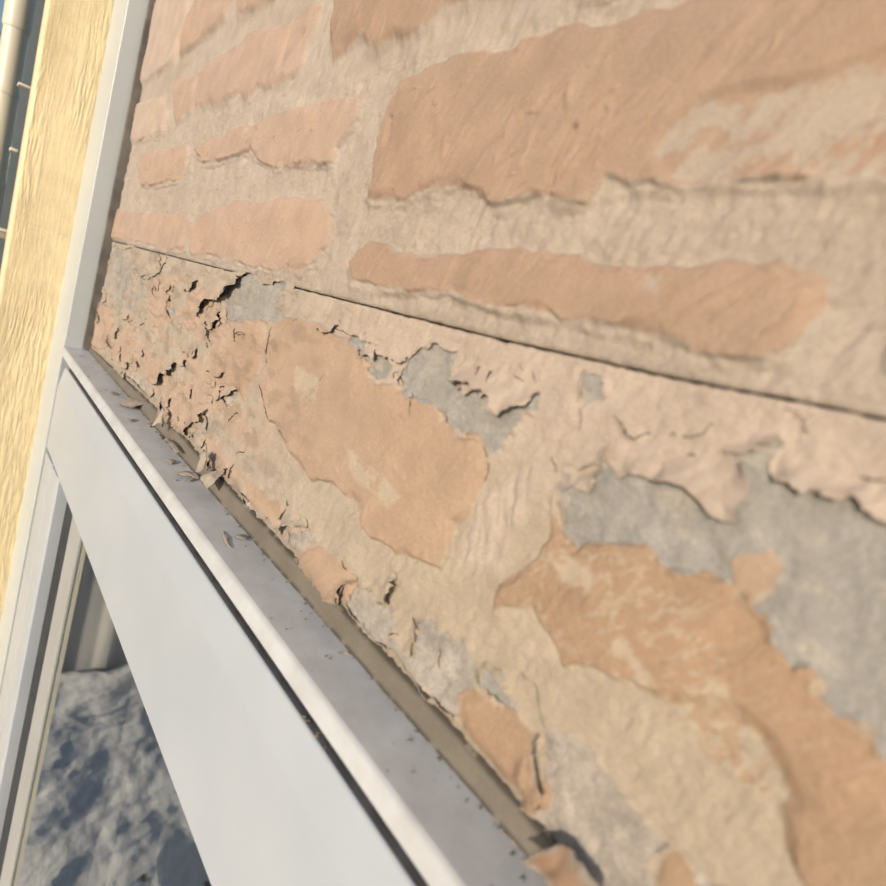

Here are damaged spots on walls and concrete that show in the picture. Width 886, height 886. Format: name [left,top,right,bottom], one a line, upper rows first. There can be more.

crack [96,312,148,361]
crack [143,253,167,296]
crack [200,316,245,348]
crack [258,327,286,443]
crack [200,386,249,503]
peeling [98,243,545,725]
peeling [552,428,886,776]
peeling [516,722,739,886]